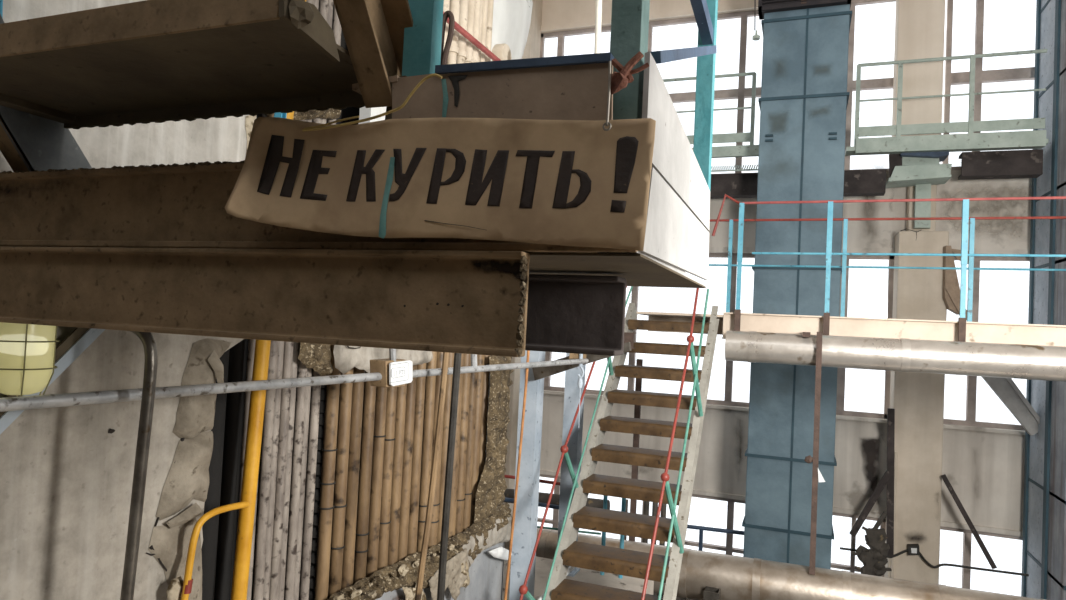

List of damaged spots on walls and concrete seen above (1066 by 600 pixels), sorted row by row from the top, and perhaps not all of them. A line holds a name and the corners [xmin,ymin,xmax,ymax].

spalling [333,345,433,374]
peeling [148,338,231,600]
spalling [455,516,512,565]